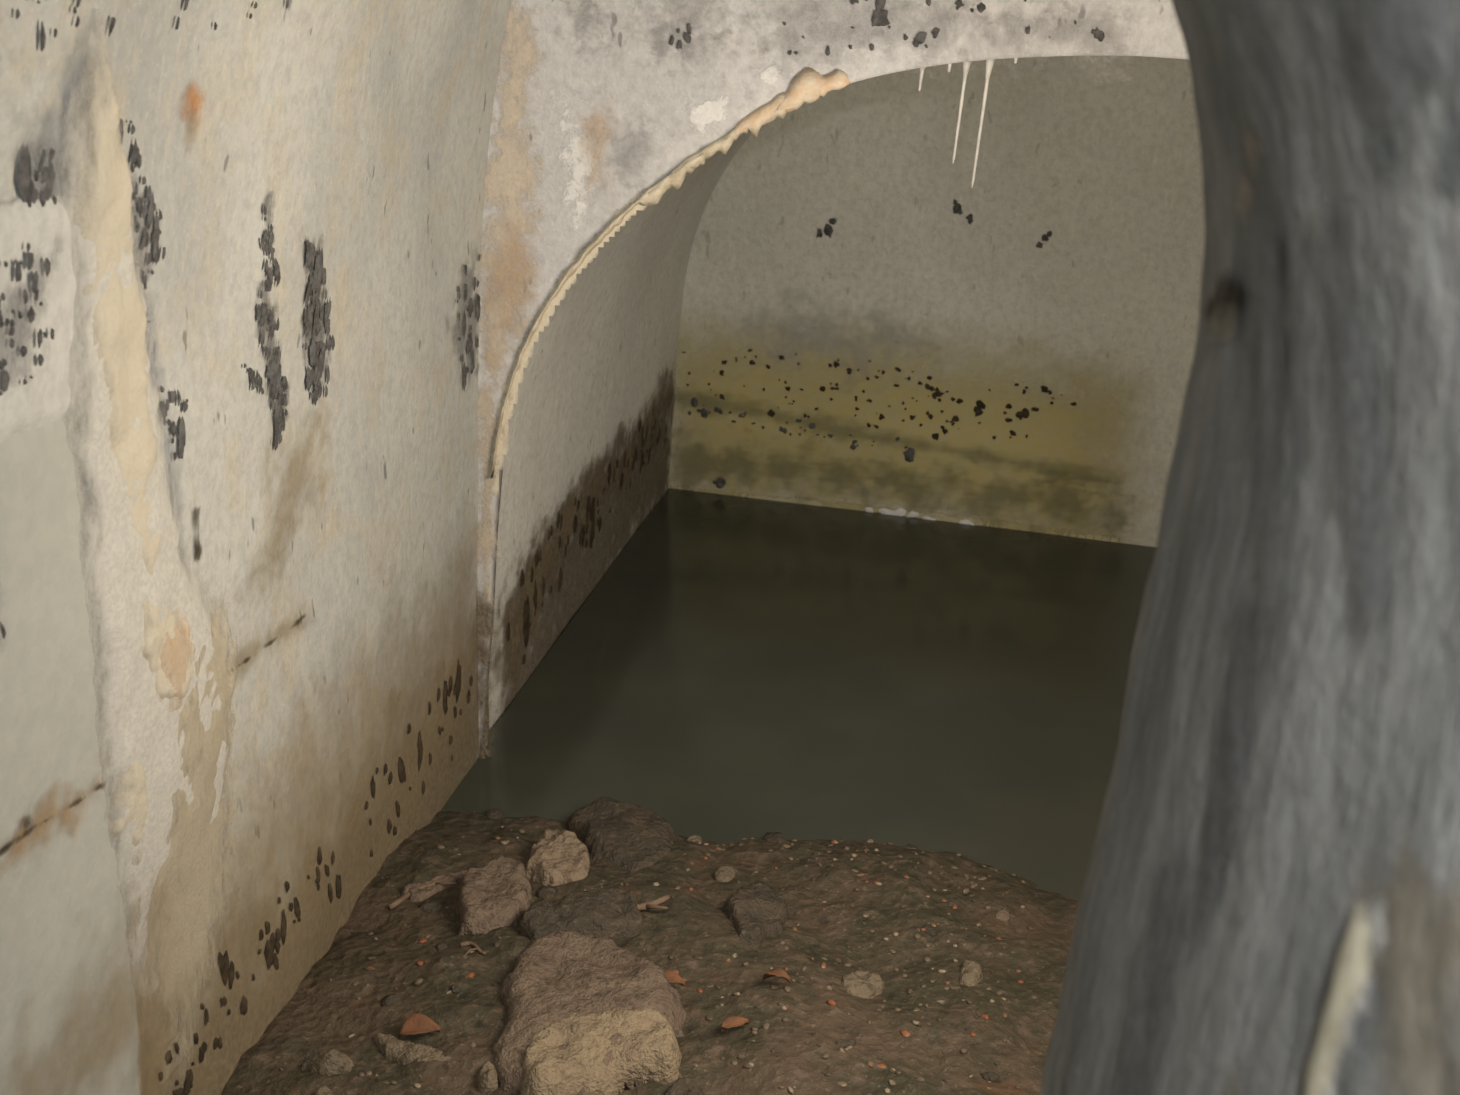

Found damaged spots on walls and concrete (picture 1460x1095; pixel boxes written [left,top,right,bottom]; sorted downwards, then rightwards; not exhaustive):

leakage [40,21,57,52]
leakage [0,265,46,376]
leakage [118,119,166,290]
spalling [491,68,850,478]
leakage [140,0,1120,1095]